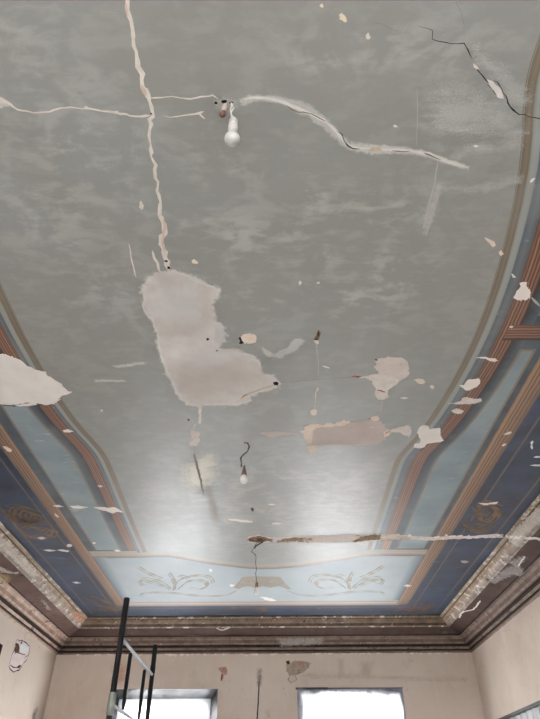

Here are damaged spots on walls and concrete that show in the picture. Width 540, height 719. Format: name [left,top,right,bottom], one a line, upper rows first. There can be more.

crack [419,26,540,119]
crack [0,0,218,272]
crack [239,94,470,171]
flaking render [511,274,540,306]
flaking render [238,333,257,344]
flaking render [0,354,72,407]
flaking render [448,378,482,414]
flaking render [386,424,444,448]
crack [247,506,540,547]
flaking render [9,639,30,673]
flaking render [270,637,332,683]